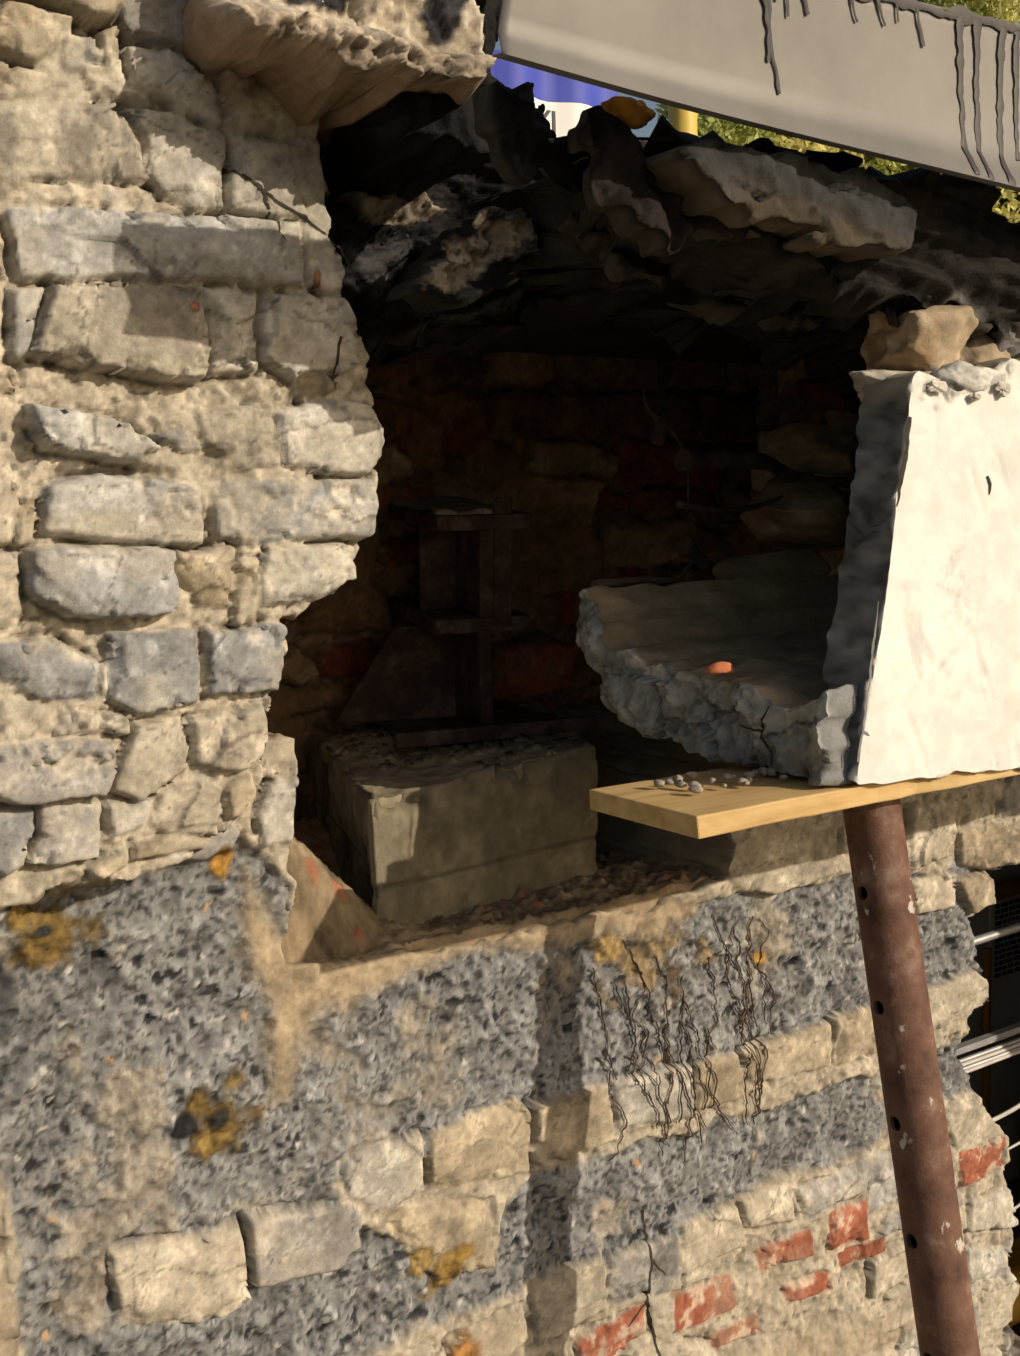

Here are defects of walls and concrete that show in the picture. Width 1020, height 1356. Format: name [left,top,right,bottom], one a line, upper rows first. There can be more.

flaking render [923,362,1015,402]
spalling [266,351,763,823]
crack [628,1206,666,1356]